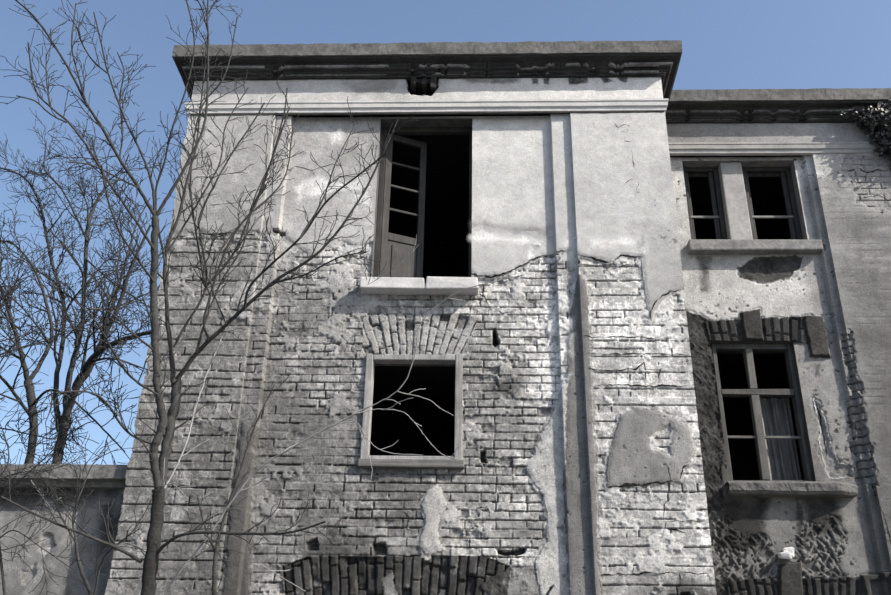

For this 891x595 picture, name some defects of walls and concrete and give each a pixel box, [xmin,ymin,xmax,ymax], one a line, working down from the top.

flaking render [837,154,891,214]
crack [471,250,640,318]
crack [585,290,684,387]
flaking render [466,250,848,595]
crack [813,394,827,453]
flaking render [813,331,877,486]
hole [306,536,320,551]
hole [373,541,388,556]
flaking render [420,486,447,556]
water stain [719,497,769,551]
water stain [797,500,841,538]